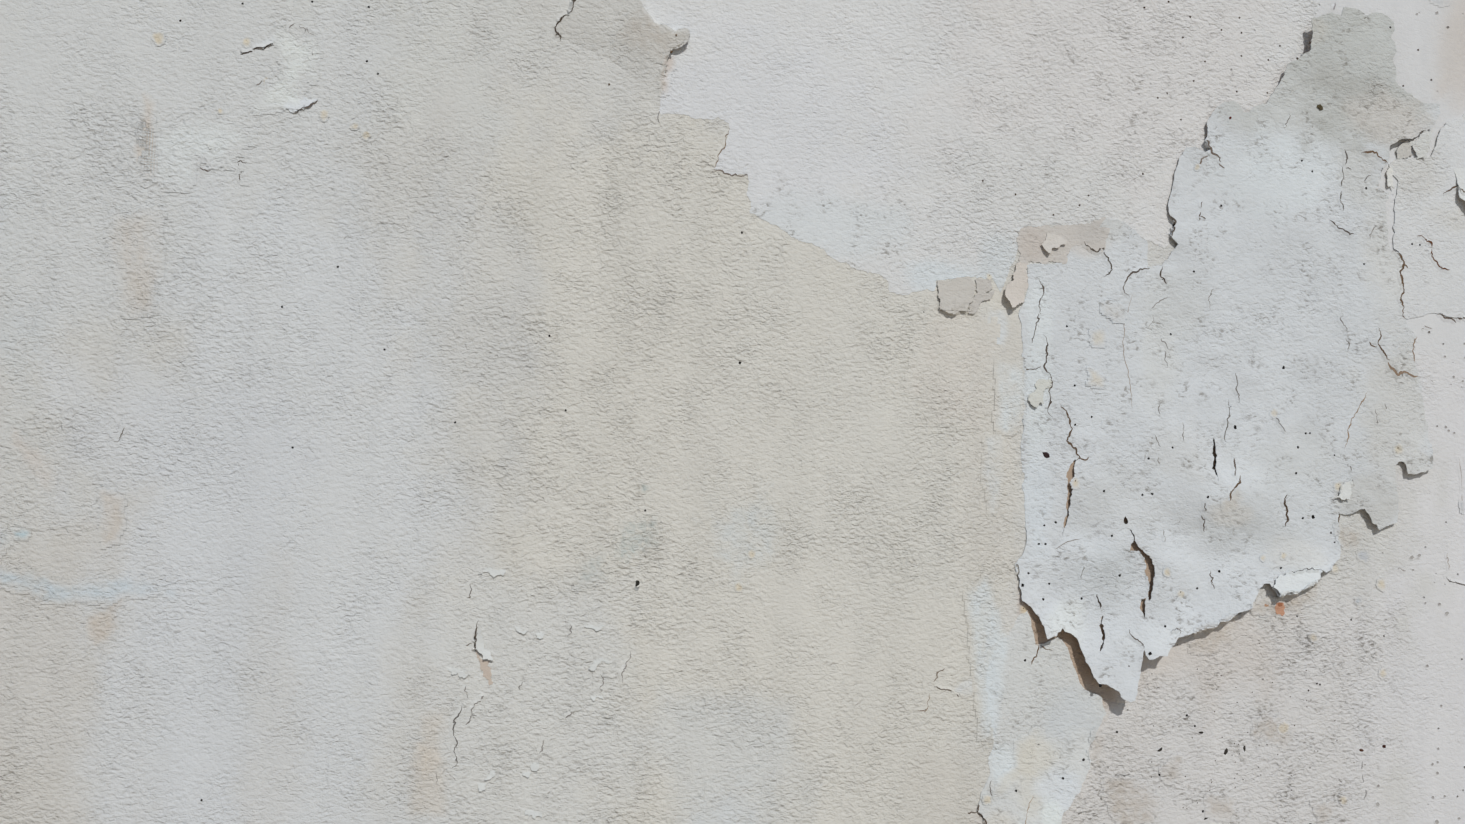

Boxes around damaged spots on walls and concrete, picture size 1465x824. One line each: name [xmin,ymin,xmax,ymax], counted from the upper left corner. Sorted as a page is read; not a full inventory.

crack [1199,140,1224,168]
peeling [640,0,1465,824]
crack [1026,280,1089,461]
crack [1081,200,1206,466]
crack [1199,373,1241,533]
crack [1273,417,1286,434]
crack [1329,149,1465,526]
crack [1207,571,1215,589]
crack [433,582,525,785]
crack [536,651,631,754]